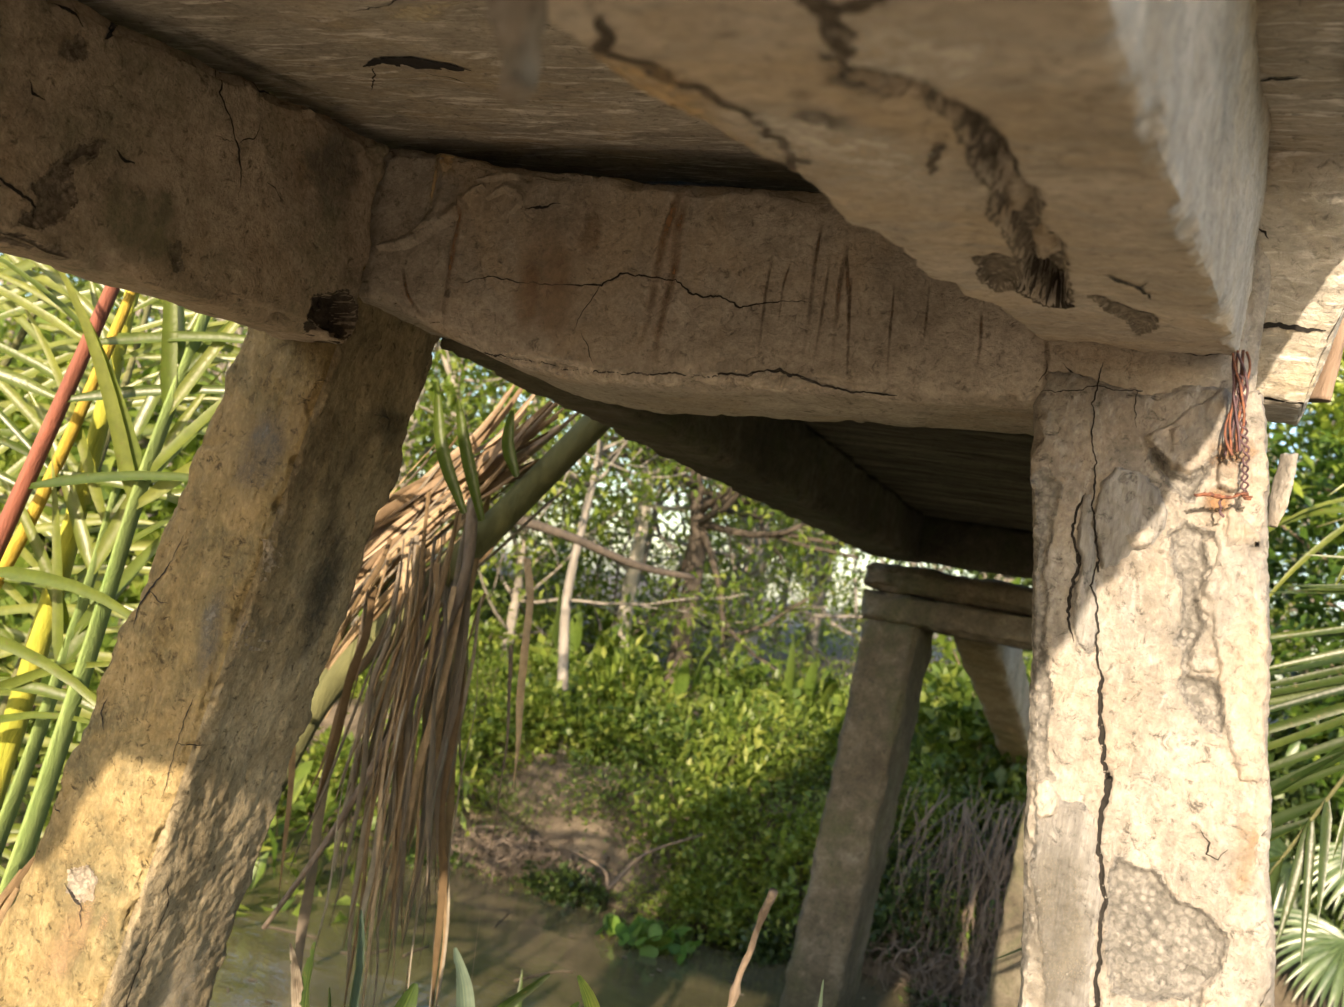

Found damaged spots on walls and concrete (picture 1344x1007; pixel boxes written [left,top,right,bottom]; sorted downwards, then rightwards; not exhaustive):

crack [363,57,471,90]
crack [590,17,812,173]
crack [796,0,887,65]
crack [925,145,946,175]
spalling [297,289,359,344]
crack [460,272,897,396]
corrosion [1208,492,1228,511]
corrosion [1218,444,1253,462]
flaking render [1072,387,1299,784]
crack [1038,363,1142,1007]
spalling [1028,466,1230,1007]
crack [126,880,171,1007]